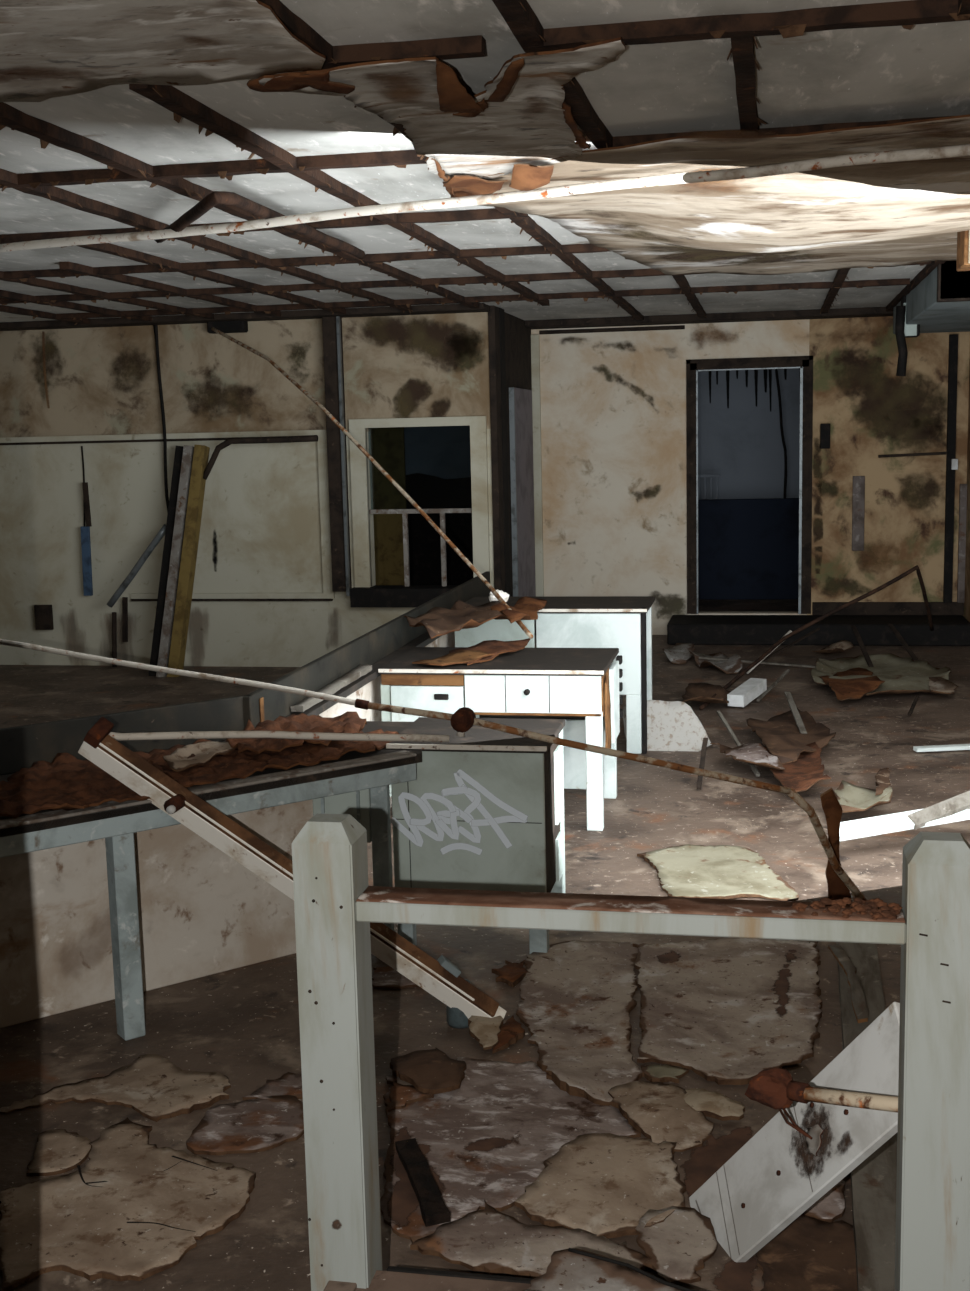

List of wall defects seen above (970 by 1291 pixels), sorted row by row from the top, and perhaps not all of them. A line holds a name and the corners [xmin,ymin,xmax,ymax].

leakage [33,336,62,397]
leakage [114,353,150,391]
leakage [291,346,307,376]
leakage [363,317,483,371]
leakage [695,330,727,344]
leakage [186,374,254,413]
leakage [394,379,450,418]
leakage [834,335,947,451]
leakage [900,476,939,509]
leakage [813,439,891,595]
peeling [805,1124,824,1156]